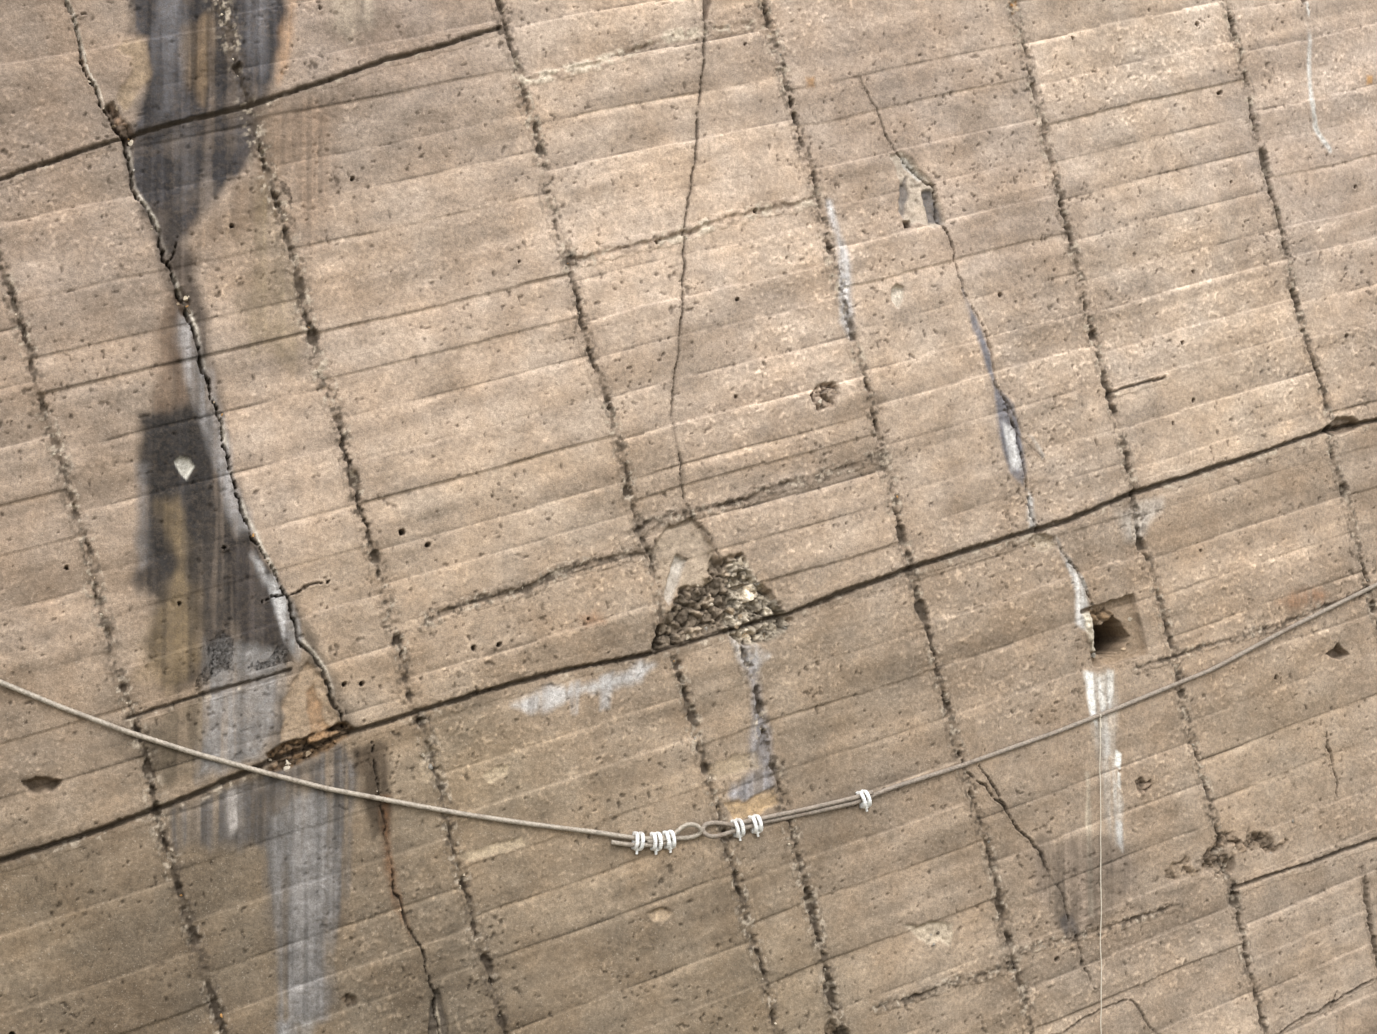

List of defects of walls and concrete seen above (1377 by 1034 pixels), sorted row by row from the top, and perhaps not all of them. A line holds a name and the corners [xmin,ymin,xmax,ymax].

crack [0,0,443,1034]
damp [118,0,360,792]
damp [169,735,395,1034]
damp [319,0,381,53]
crack [208,0,1185,1034]
spalling [654,519,794,646]
damp [1013,667,1148,954]
crack [1003,0,1377,1034]